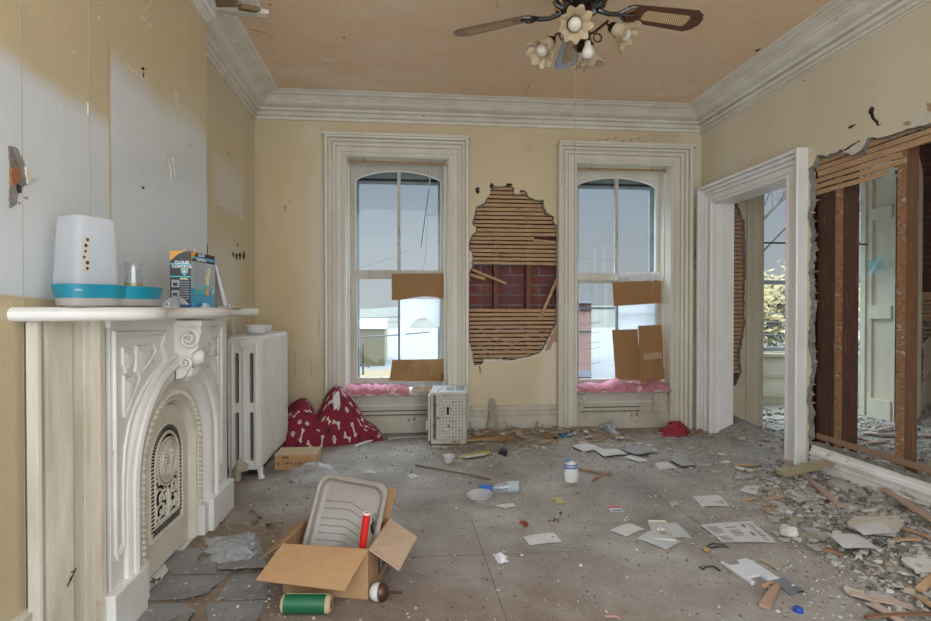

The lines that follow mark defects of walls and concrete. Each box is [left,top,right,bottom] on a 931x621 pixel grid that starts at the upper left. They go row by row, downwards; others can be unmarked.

spalling [8,146,36,208]
spalling [469,183,556,371]
spalling [733,200,746,420]
spalling [806,103,931,440]